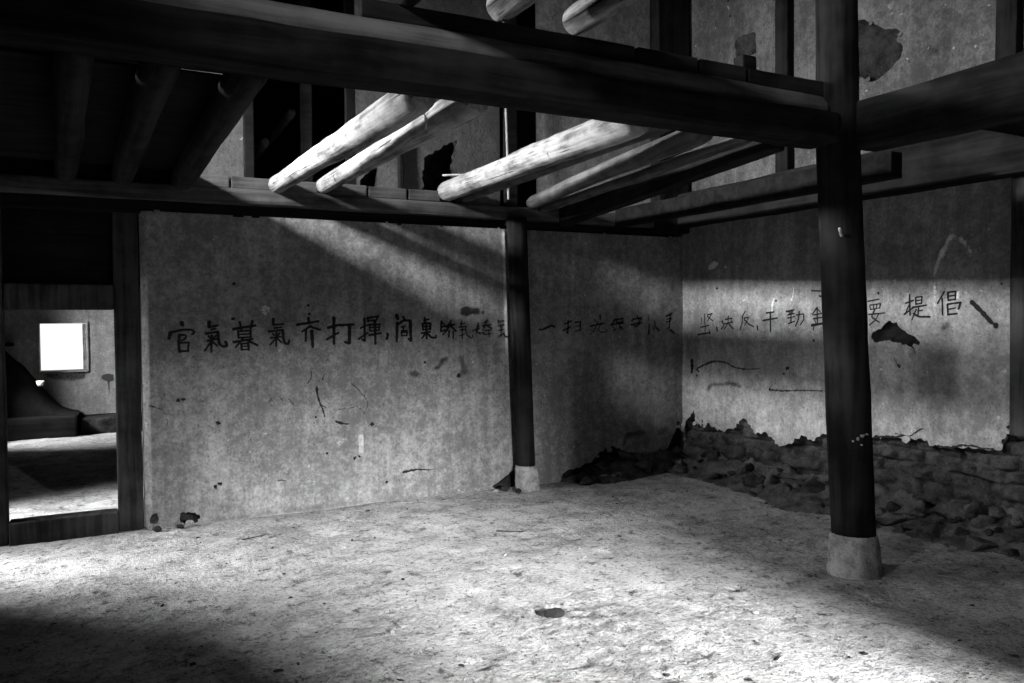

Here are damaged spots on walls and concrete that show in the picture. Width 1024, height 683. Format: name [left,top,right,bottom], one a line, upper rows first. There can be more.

flaking render [858,19,903,82]
flaking render [422,140,457,203]
flaking render [868,320,920,349]
flaking render [561,446,621,480]
flaking render [665,410,828,475]
flaking render [872,414,1024,511]